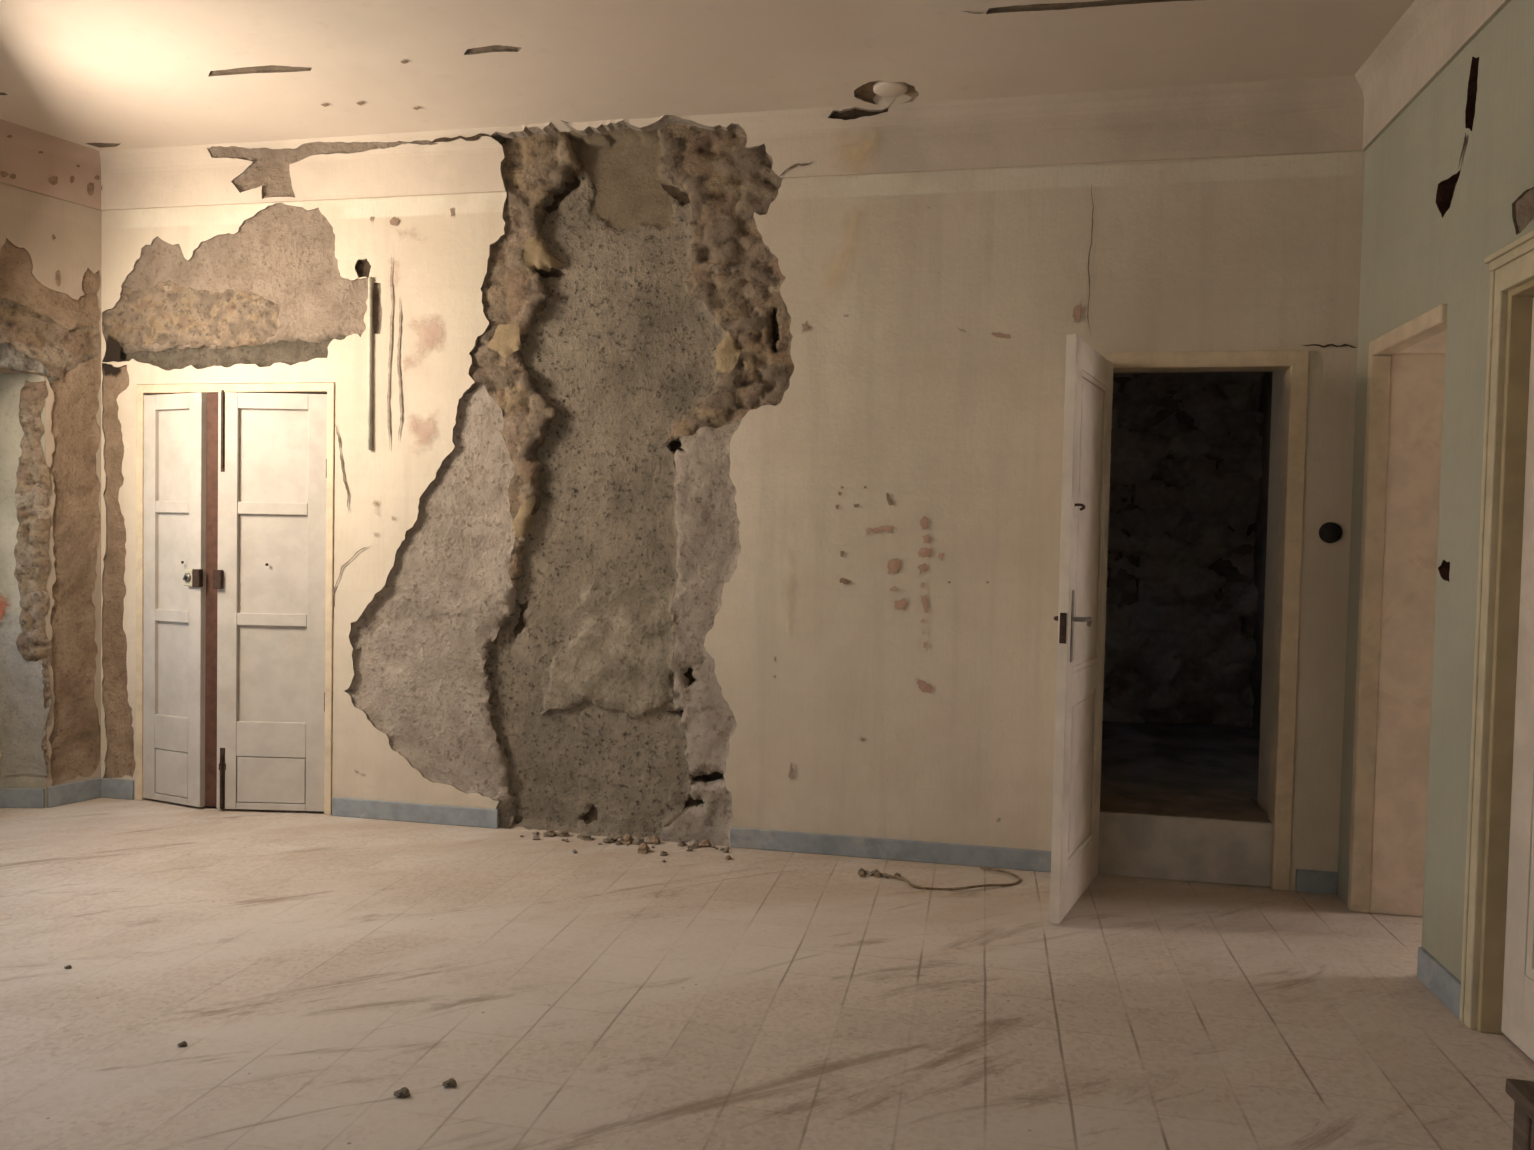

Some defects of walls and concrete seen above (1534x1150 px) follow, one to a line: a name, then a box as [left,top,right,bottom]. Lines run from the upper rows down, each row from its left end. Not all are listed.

flaking render [0,203,371,786]
flaking render [346,124,810,846]
peeling [888,516,944,648]
flaking render [1516,189,1534,233]